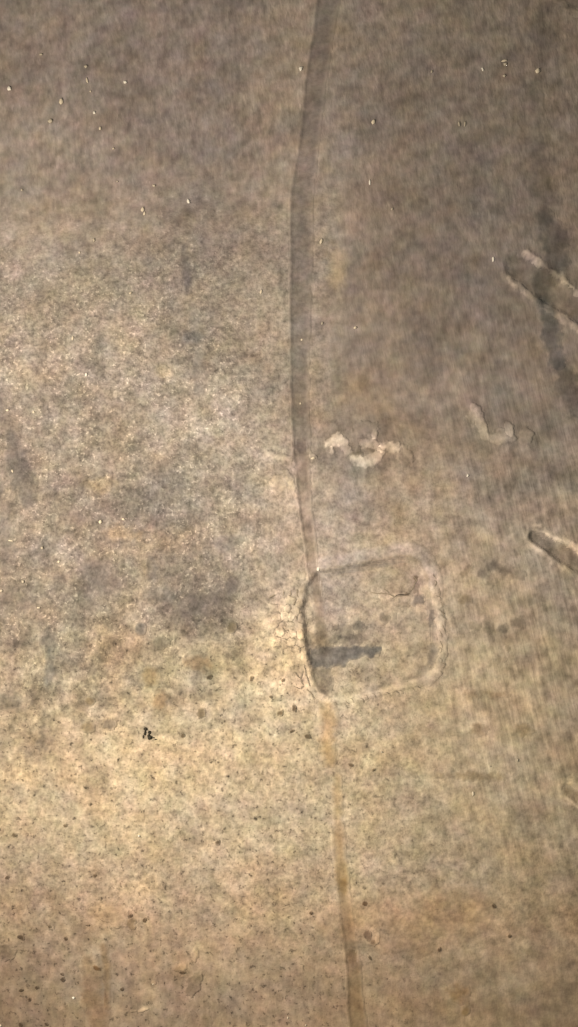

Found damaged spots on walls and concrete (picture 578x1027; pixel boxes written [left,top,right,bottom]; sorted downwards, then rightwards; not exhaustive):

damp [521,74,573,285]
damp [533,298,578,425]
damp [302,619,382,696]
damp [379,580,436,627]